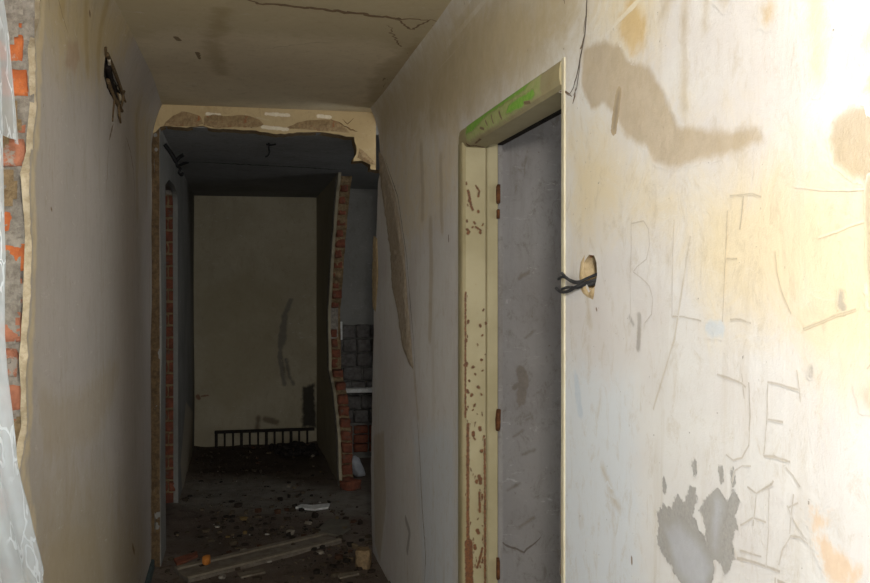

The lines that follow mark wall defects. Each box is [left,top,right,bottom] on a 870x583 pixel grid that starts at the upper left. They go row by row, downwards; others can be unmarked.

flaking render [0,0,47,583]
flaking render [151,111,349,567]
crack [248,0,437,54]
rust [462,291,488,583]
water stain [580,37,767,173]
spalling [656,459,740,583]
water stain [825,100,870,307]